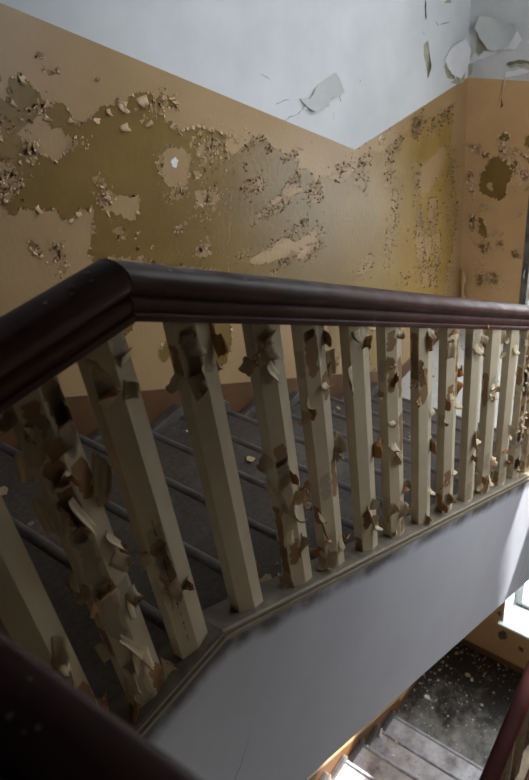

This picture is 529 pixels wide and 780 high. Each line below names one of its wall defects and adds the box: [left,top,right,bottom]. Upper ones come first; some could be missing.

peeling [424,41,433,78]
peeling [444,16,522,84]
peeling [0,71,529,302]
peeling [158,323,233,385]
peeling [295,328,320,378]
peeling [328,326,341,366]
peeling [368,327,444,428]
peeling [446,331,481,402]
peeling [482,334,529,493]
peeling [19,378,94,553]
peeling [273,443,292,504]
peeling [147,522,177,587]